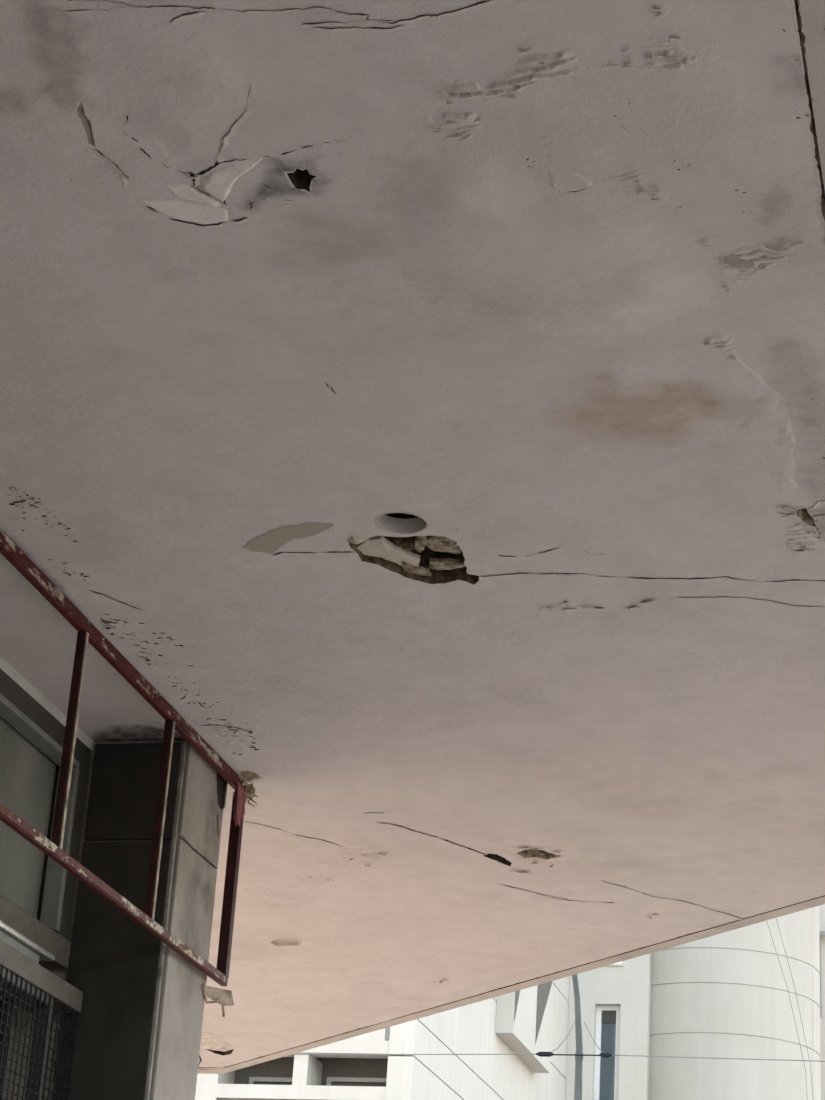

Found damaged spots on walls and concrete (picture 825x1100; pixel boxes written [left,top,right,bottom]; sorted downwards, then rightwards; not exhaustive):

crack [48,0,517,33]
crack [91,79,349,229]
peeling [5,483,78,542]
peeling [244,523,333,553]
spalling [347,535,479,585]
crack [481,548,825,608]
peeling [782,507,821,553]
peeling [0,529,260,812]
crack [183,814,219,870]
crack [366,813,485,855]
peeling [484,843,574,874]
crack [501,881,742,920]